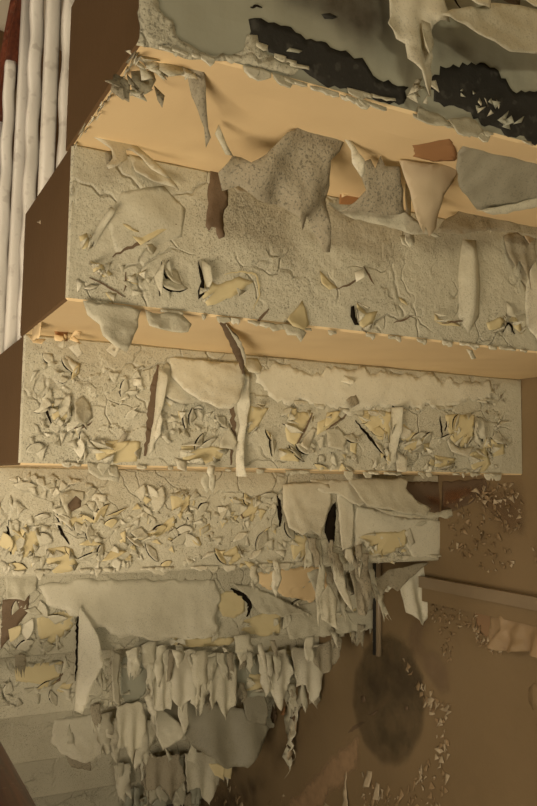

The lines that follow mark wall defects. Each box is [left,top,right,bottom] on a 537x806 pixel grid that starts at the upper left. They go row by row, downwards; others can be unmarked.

peeling [0,0,10,32]
damp [318,0,383,35]
peeling [0,259,527,806]
peeling [472,613,537,658]